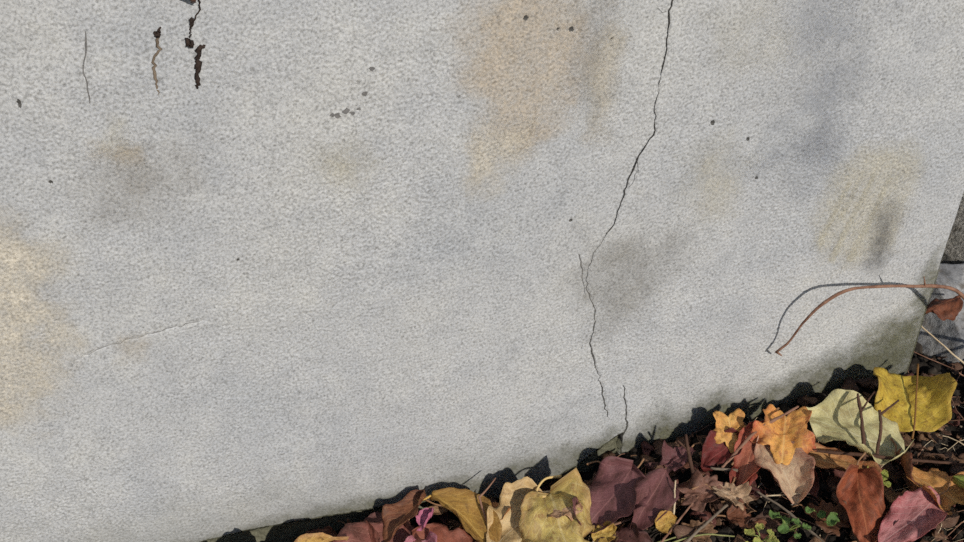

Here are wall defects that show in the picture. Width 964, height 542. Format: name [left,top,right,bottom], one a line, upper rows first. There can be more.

crack [579,0,673,454]